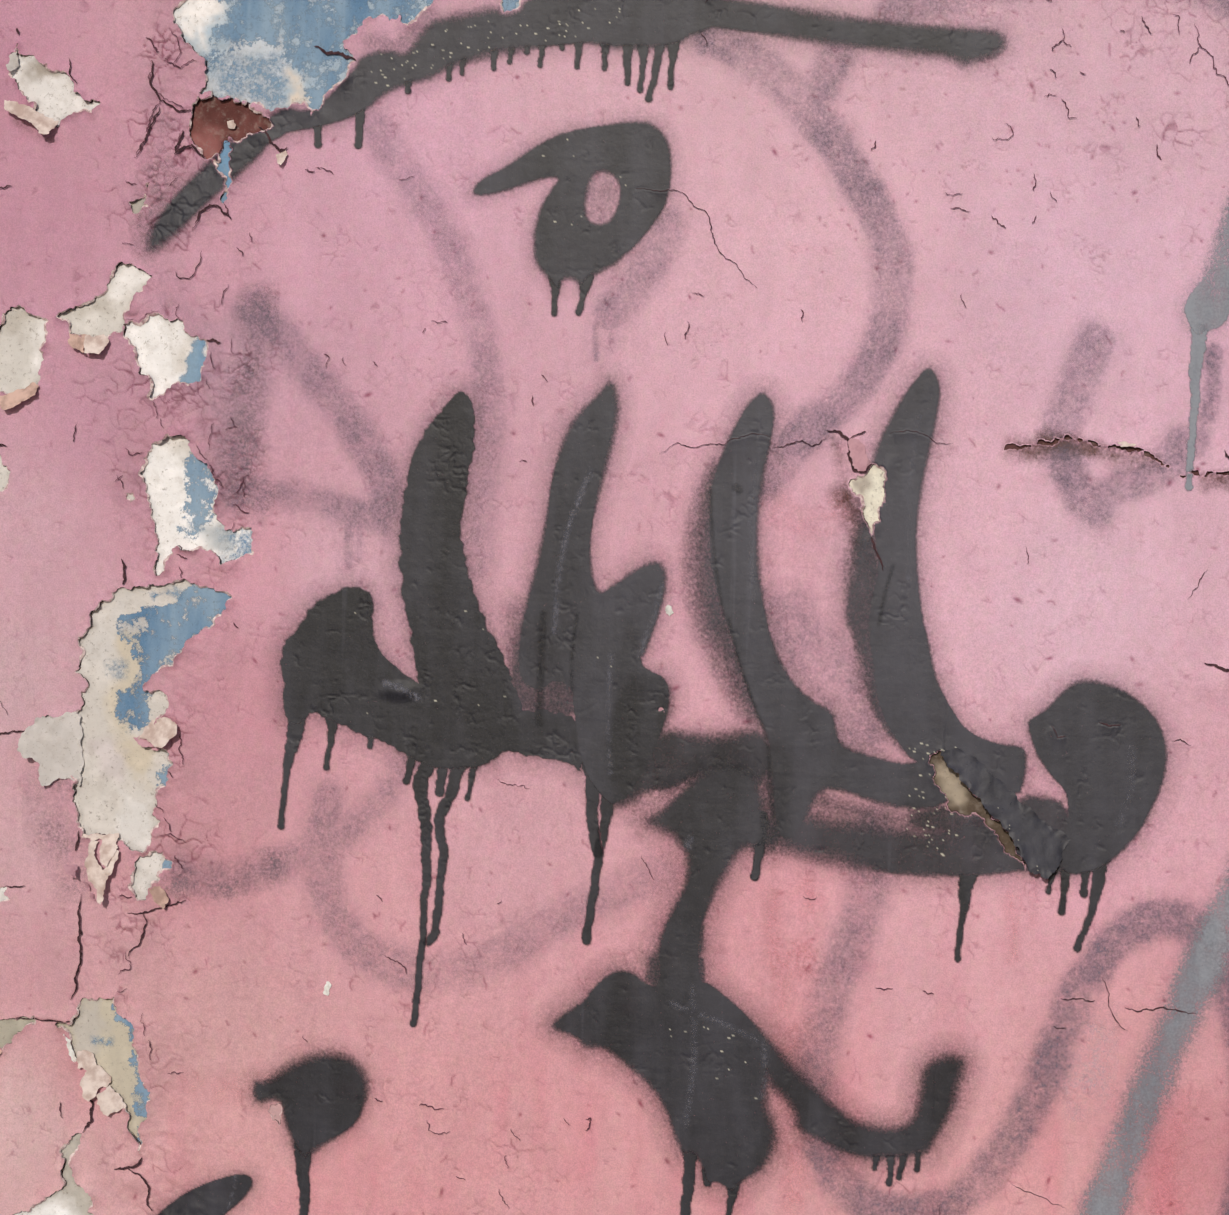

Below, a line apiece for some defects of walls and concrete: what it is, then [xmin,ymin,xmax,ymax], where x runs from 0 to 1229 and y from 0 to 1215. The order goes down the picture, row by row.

peeling [4,50,101,135]
crack [126,31,204,185]
peeling [136,0,433,223]
crack [175,204,252,321]
peeling [0,262,221,410]
crack [197,419,249,531]
peeling [827,430,885,570]
crack [1004,435,1229,478]
peeling [0,435,253,909]
crack [155,804,184,869]
crack [13,900,82,1023]
peeling [14,998,152,1215]